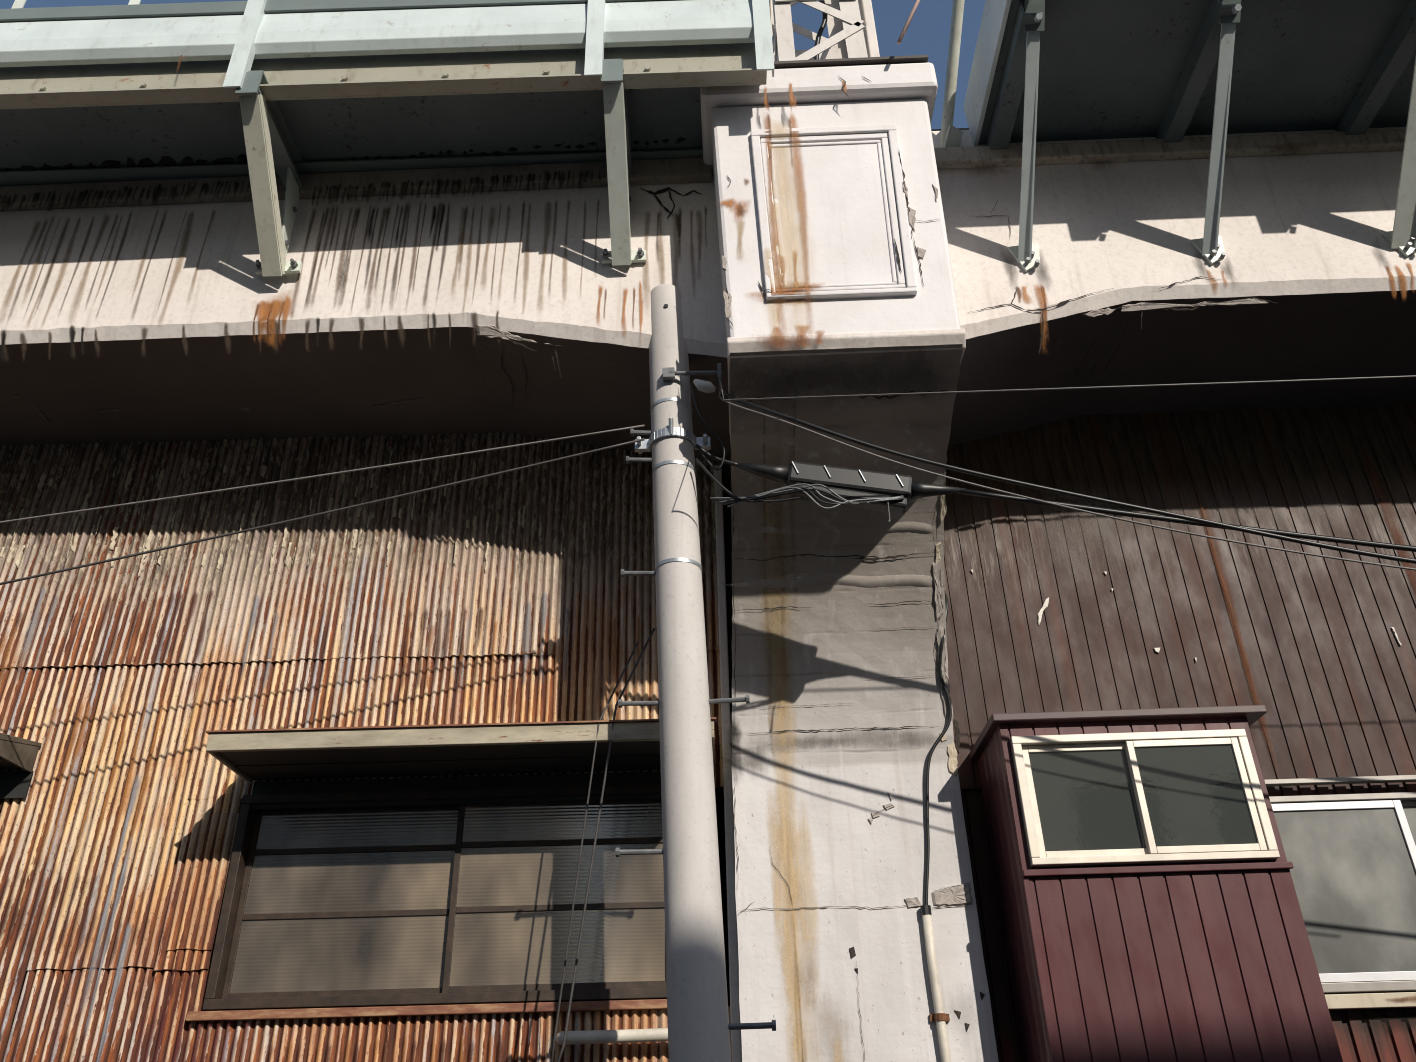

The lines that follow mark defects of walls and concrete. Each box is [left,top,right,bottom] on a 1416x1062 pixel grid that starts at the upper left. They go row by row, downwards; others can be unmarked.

leakage [0,180,250,303]
leakage [295,171,601,300]
rust [764,84,816,300]
leakage [1,330,26,359]
leakage [70,326,100,353]
crack [968,288,1113,353]
rust [95,591,213,658]
crack [729,443,939,734]
peeling [1037,597,1049,625]
rust [81,702,163,837]
crack [734,779,908,912]
rust [0,875,96,941]